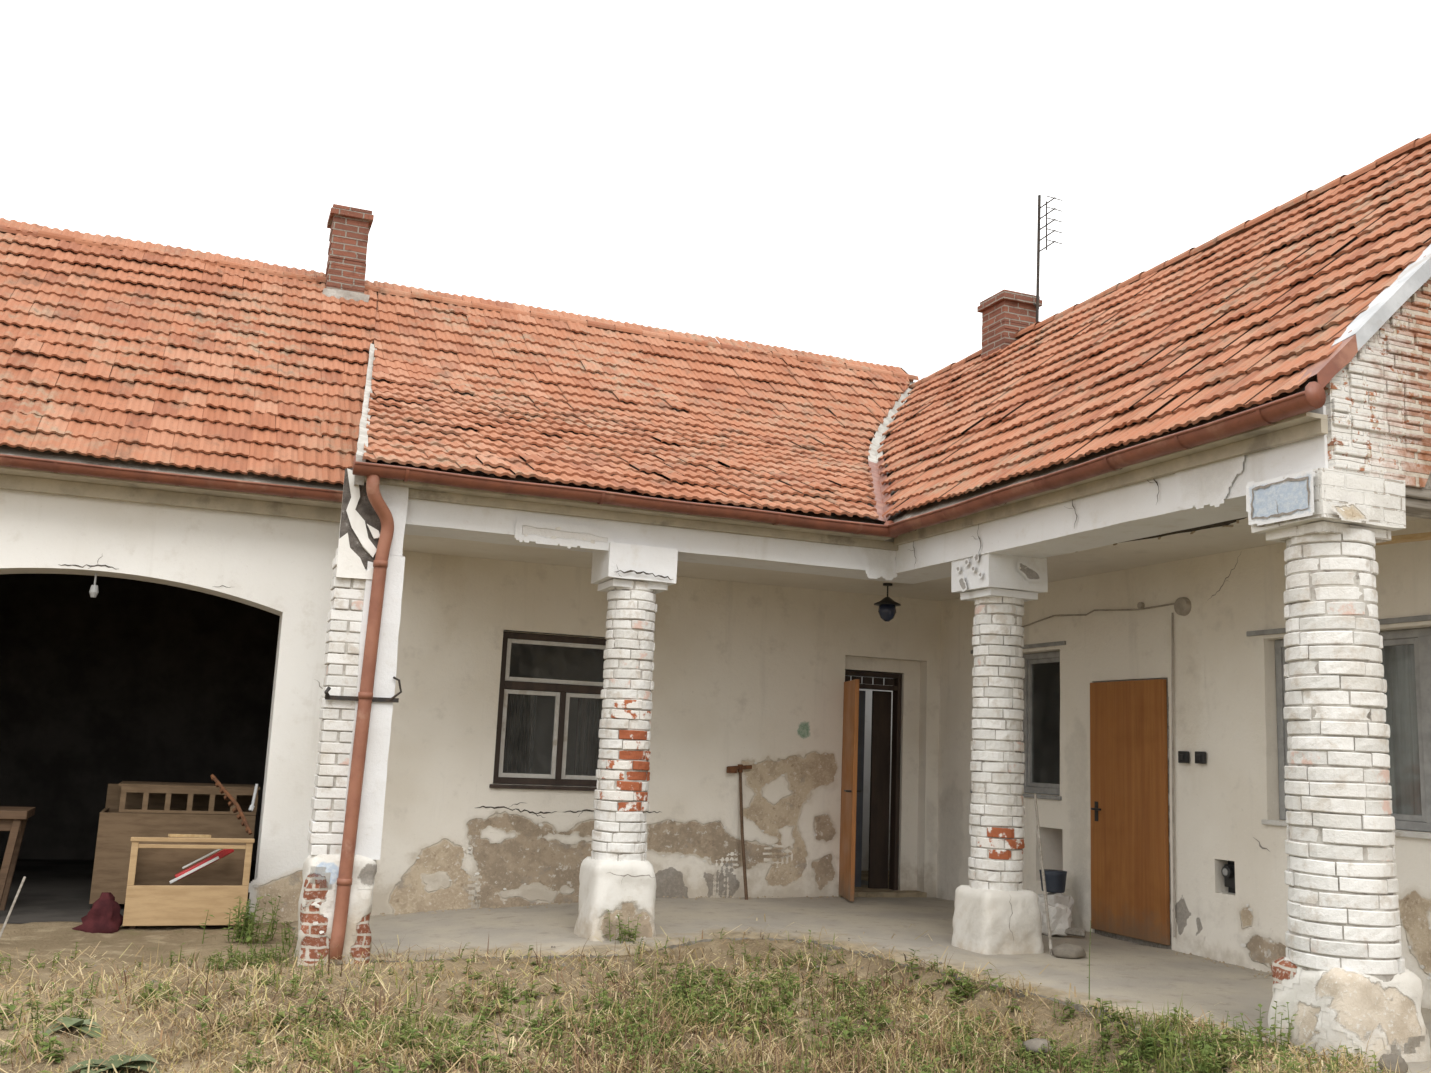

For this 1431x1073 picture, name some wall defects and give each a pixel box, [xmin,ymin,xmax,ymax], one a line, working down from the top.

peeling [246,700,842,966]
spalling [977,827,1025,860]
peeling [1234,880,1431,1055]